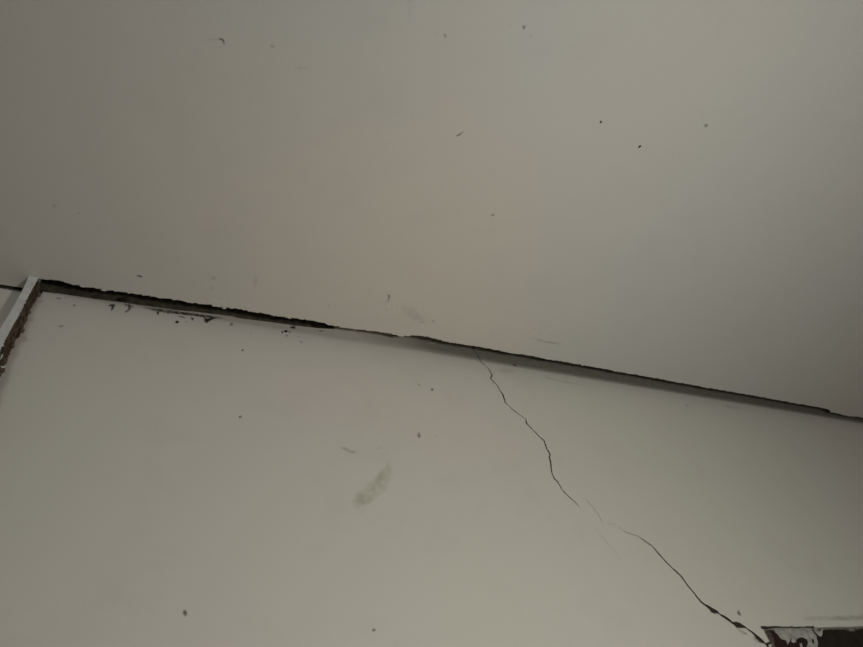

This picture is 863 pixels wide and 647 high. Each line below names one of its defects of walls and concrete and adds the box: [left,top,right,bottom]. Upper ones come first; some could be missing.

crack [472,346,576,503]
crack [652,546,772,647]
peeling [761,626,823,647]